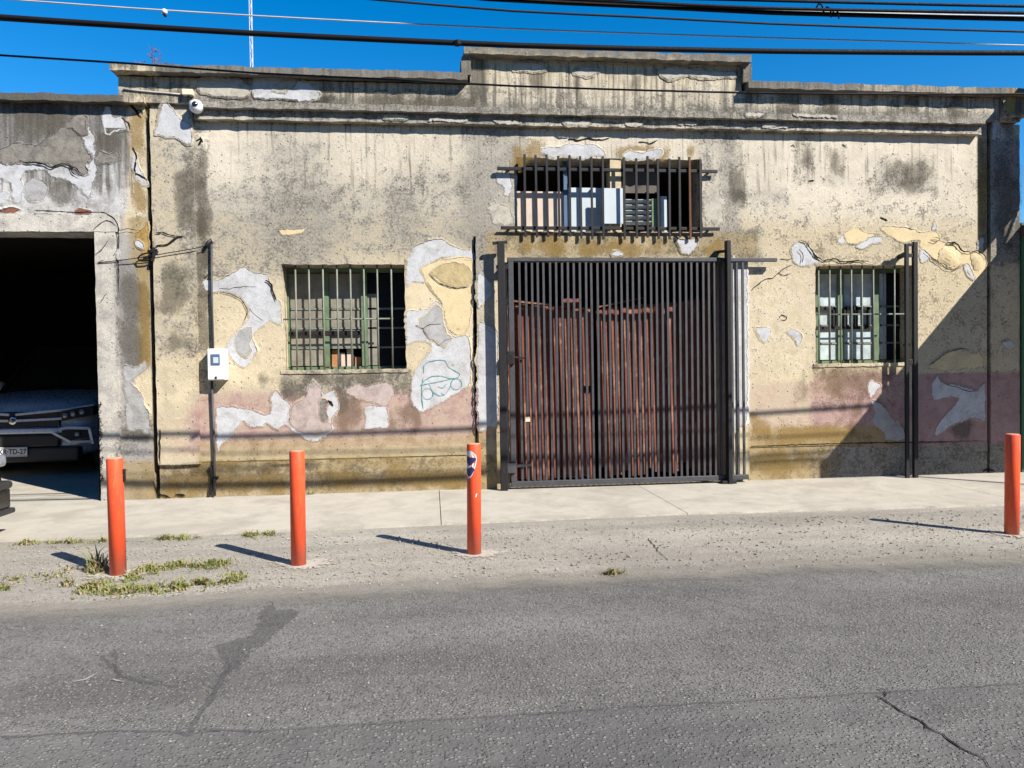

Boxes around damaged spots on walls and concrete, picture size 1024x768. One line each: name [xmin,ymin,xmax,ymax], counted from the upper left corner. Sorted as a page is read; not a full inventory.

spalling [0,105,151,215]
peeling [154,103,194,146]
peeling [196,76,323,103]
peeling [540,142,607,161]
peeling [622,148,664,161]
water stain [121,153,211,365]
peeling [789,219,988,282]
peeling [202,266,283,369]
peeling [404,237,500,433]
peeling [214,378,396,453]
peeling [929,347,987,437]
crack [876,688,991,768]